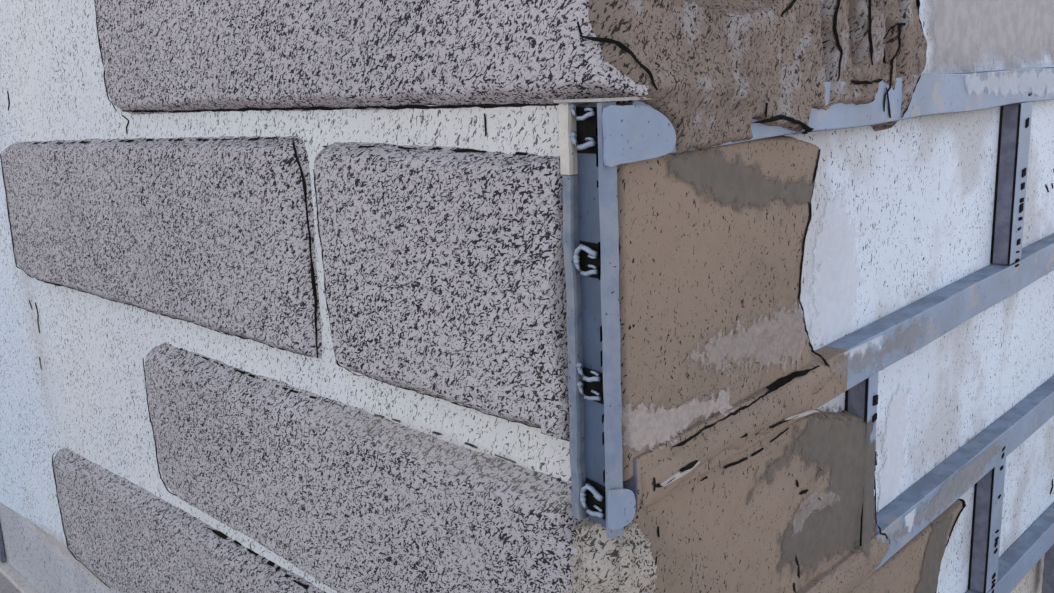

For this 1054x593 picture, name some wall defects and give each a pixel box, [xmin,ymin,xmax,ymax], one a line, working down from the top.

crack [780,0,797,17]
crack [822,0,923,118]
crack [653,103,829,491]
flaking render [784,409,820,420]
flaking render [659,461,700,486]